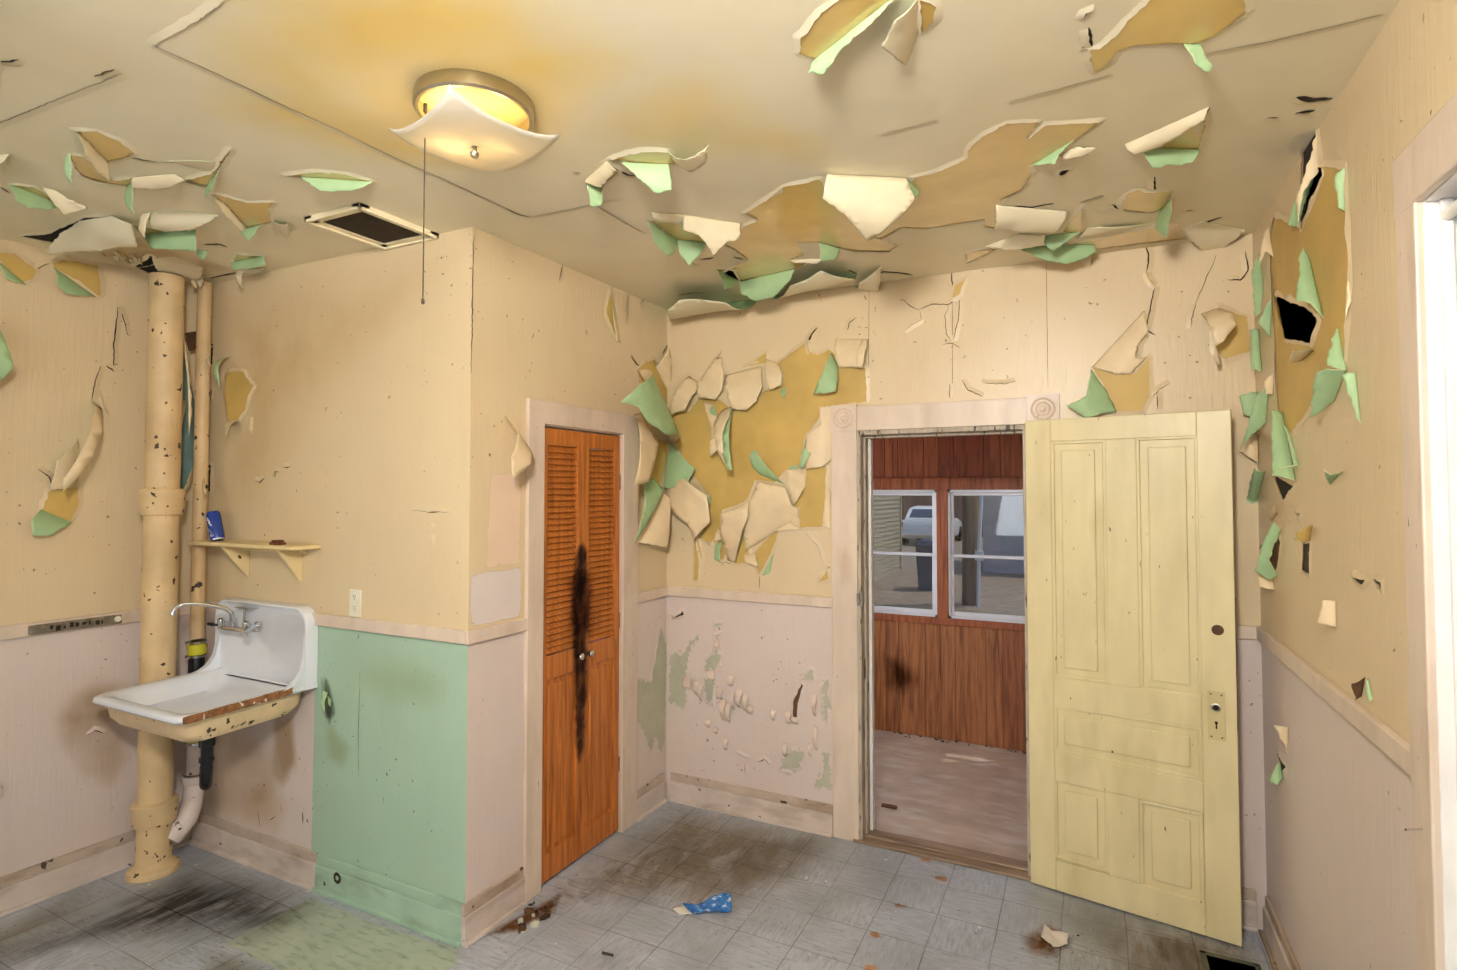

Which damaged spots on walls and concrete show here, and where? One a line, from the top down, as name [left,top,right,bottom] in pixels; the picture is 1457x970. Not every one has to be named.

peeling [792,0,944,75]
peeling [1074,0,1256,75]
peeling [0,127,290,536]
peeling [572,145,709,207]
peeling [604,287,871,588]
peeling [645,107,1246,320]
crack [899,273,1016,398]
peeling [1067,311,1170,418]
crack [1136,247,1249,356]
peeling [1202,127,1362,590]
damp [573,546,588,755]
peeling [637,608,833,792]